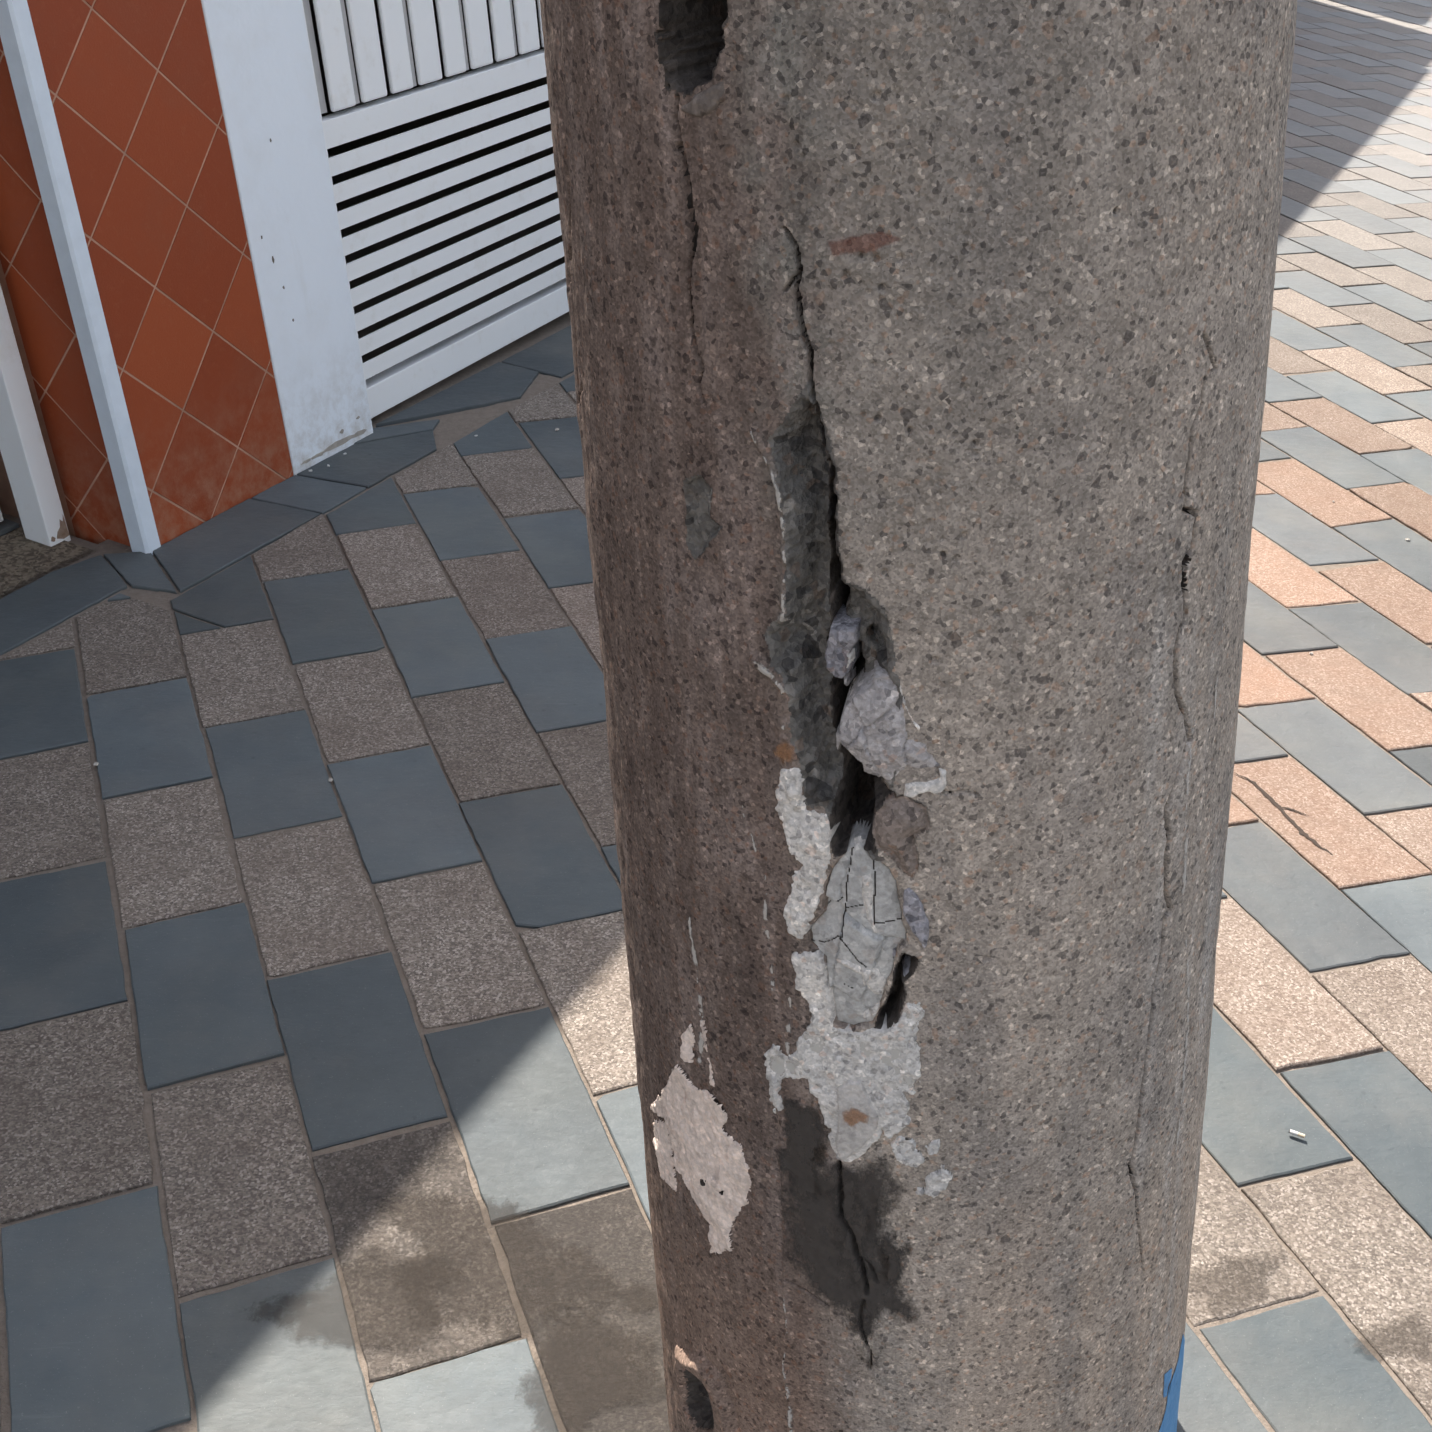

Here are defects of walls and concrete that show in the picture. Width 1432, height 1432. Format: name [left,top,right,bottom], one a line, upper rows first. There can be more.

spalling [654,0,728,118]
crack [789,231,815,388]
crack [1181,554,1192,597]
peeling [764,768,953,1198]
peeling [650,1020,752,1255]